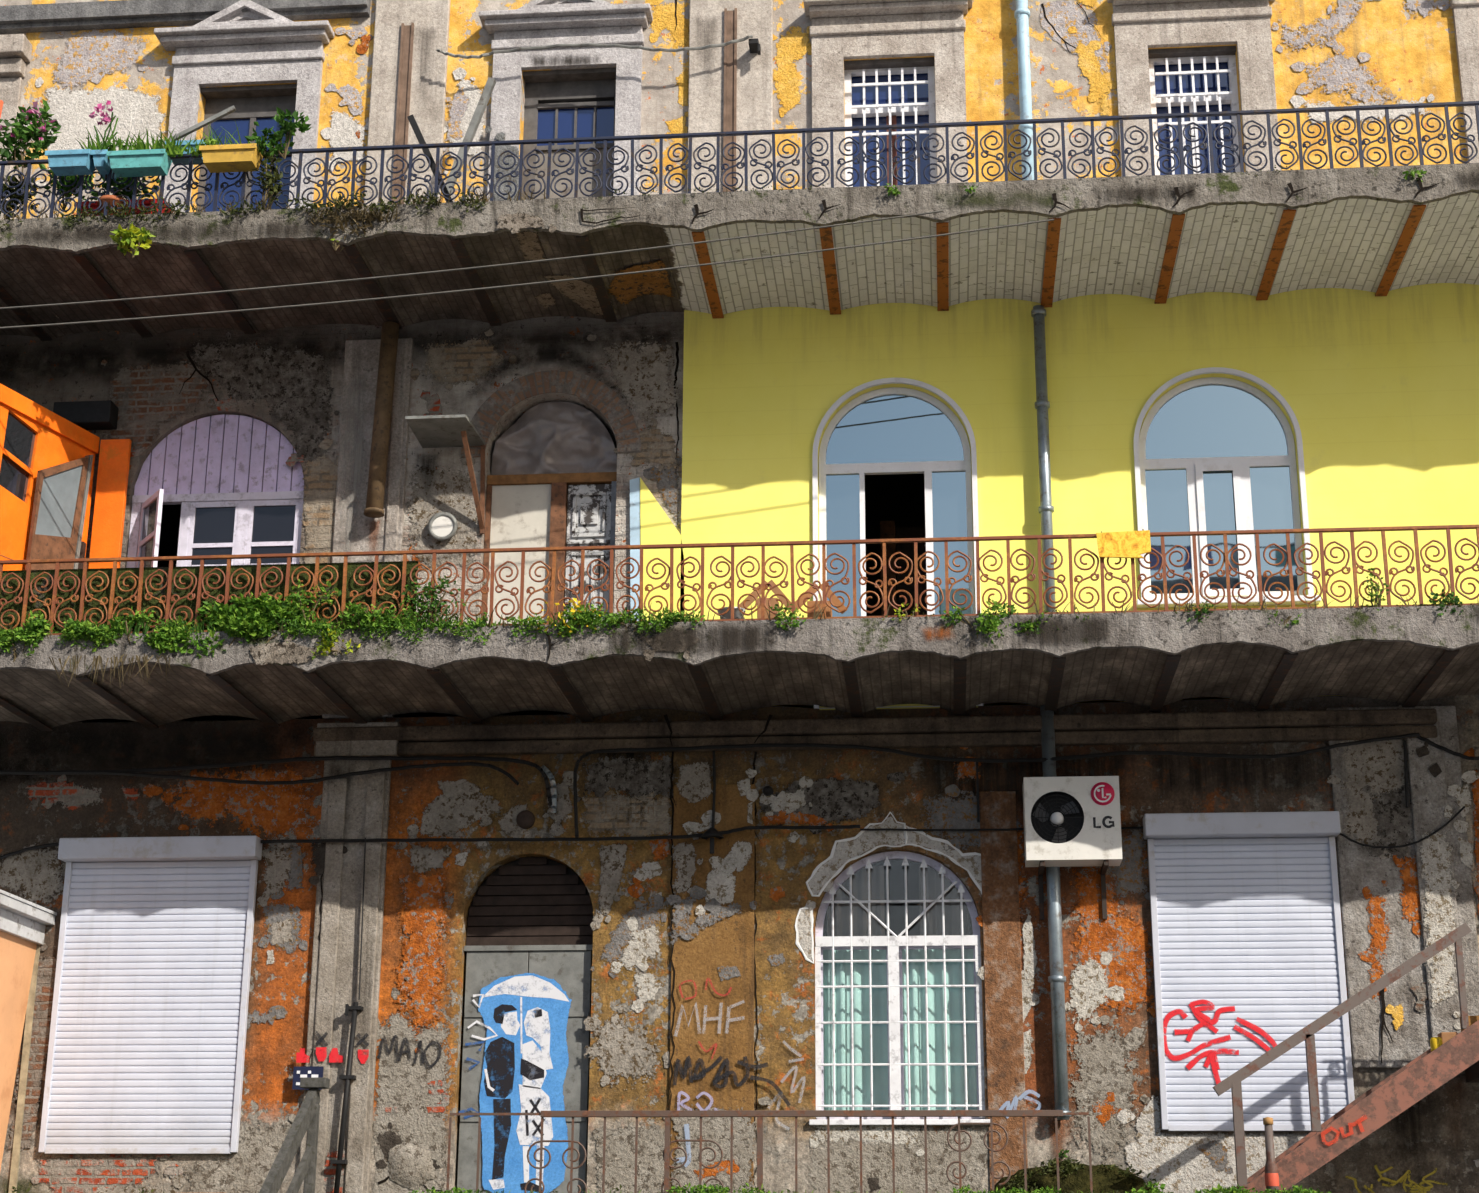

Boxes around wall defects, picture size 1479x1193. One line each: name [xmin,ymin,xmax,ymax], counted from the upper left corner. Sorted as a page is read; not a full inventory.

peeling [24,29,172,188]
peeling [773,87,803,118]
flaking render [1039,0,1117,103]
peeling [1271,0,1435,126]
flaking render [26,775,103,811]
peeling [120,762,347,964]
flaking render [369,752,772,1193]
flaking render [737,747,995,966]
peeling [1016,815,1039,1074]
peeling [1065,829,1307,1193]
peeling [1326,705,1479,1030]
peeling [806,1118,989,1193]